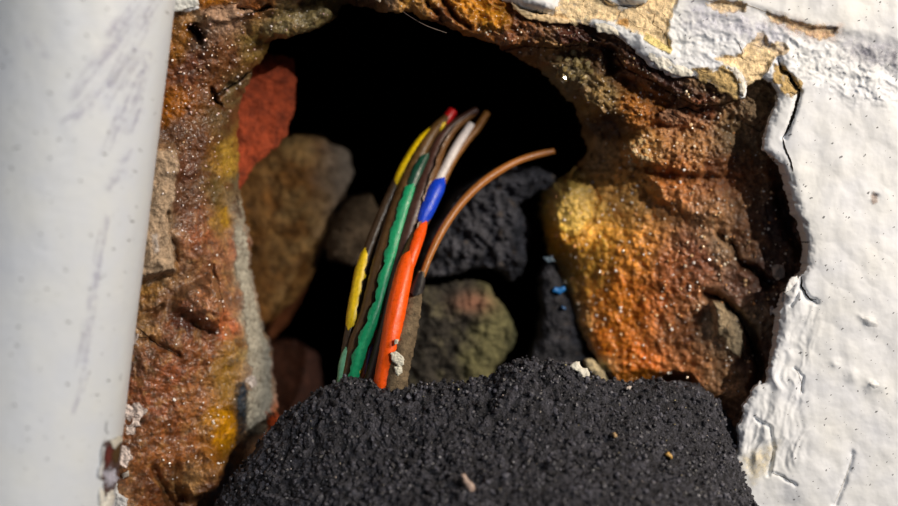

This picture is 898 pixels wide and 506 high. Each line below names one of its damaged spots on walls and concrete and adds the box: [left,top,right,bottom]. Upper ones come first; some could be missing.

spalling [98,0,803,506]
crack [738,43,800,171]